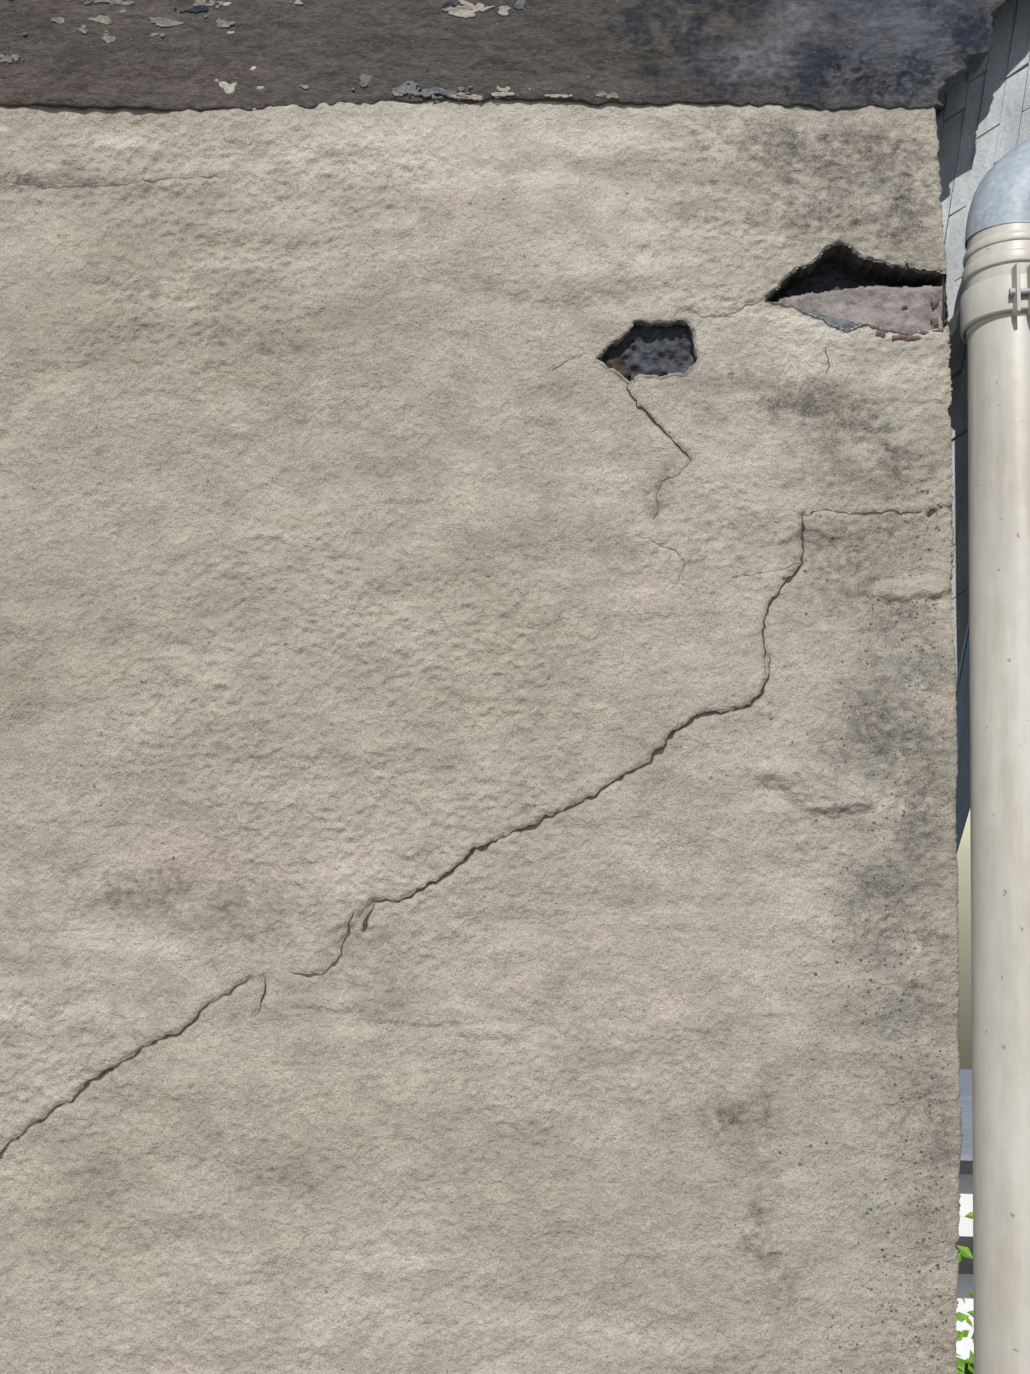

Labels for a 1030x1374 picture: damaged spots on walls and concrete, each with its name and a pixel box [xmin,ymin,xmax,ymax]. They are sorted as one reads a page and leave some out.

peeling [51,0,134,44]
peeling [149,0,235,38]
peeling [441,0,525,18]
damp [625,0,940,101]
damp [921,0,988,66]
peeling [351,74,572,102]
peeling [596,91,619,99]
spalling [764,240,946,341]
spalling [594,317,746,384]
crack [624,380,691,582]
crack [0,509,919,1158]
damp [815,591,951,1374]